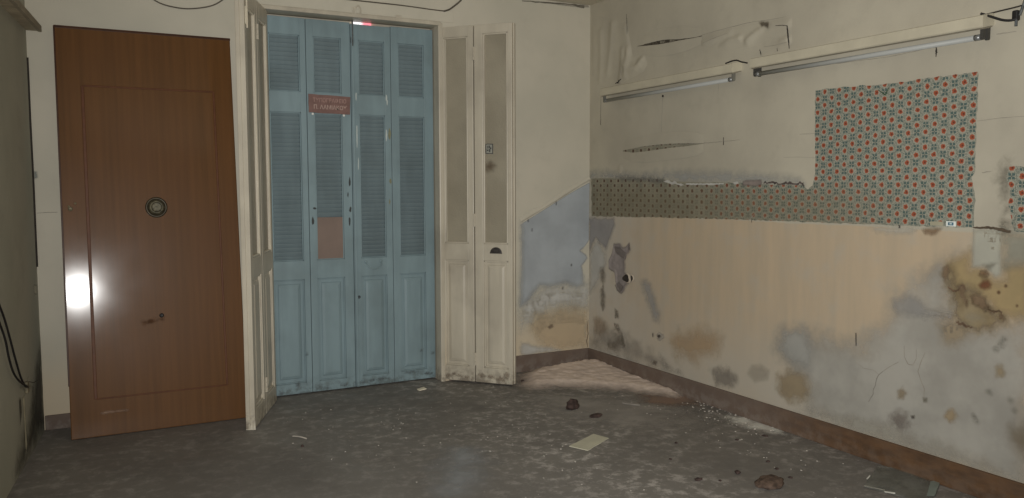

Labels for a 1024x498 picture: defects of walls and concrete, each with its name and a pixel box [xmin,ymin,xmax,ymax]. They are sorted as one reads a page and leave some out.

peeling [519,176,656,318]
leakage [943,234,1024,339]